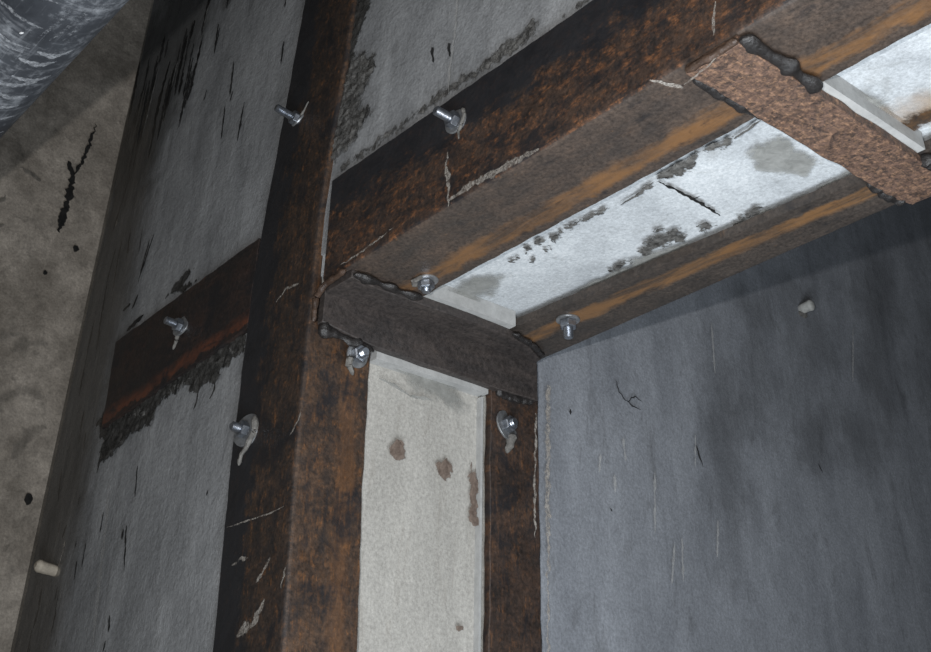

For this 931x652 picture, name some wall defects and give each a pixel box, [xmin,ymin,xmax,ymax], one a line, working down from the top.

rust [901,98,931,131]
water stain [747,137,816,177]
crack [57,124,97,232]
crack [659,182,720,216]
peeling [732,206,763,226]
peeling [607,227,687,272]
spalling [96,334,246,472]